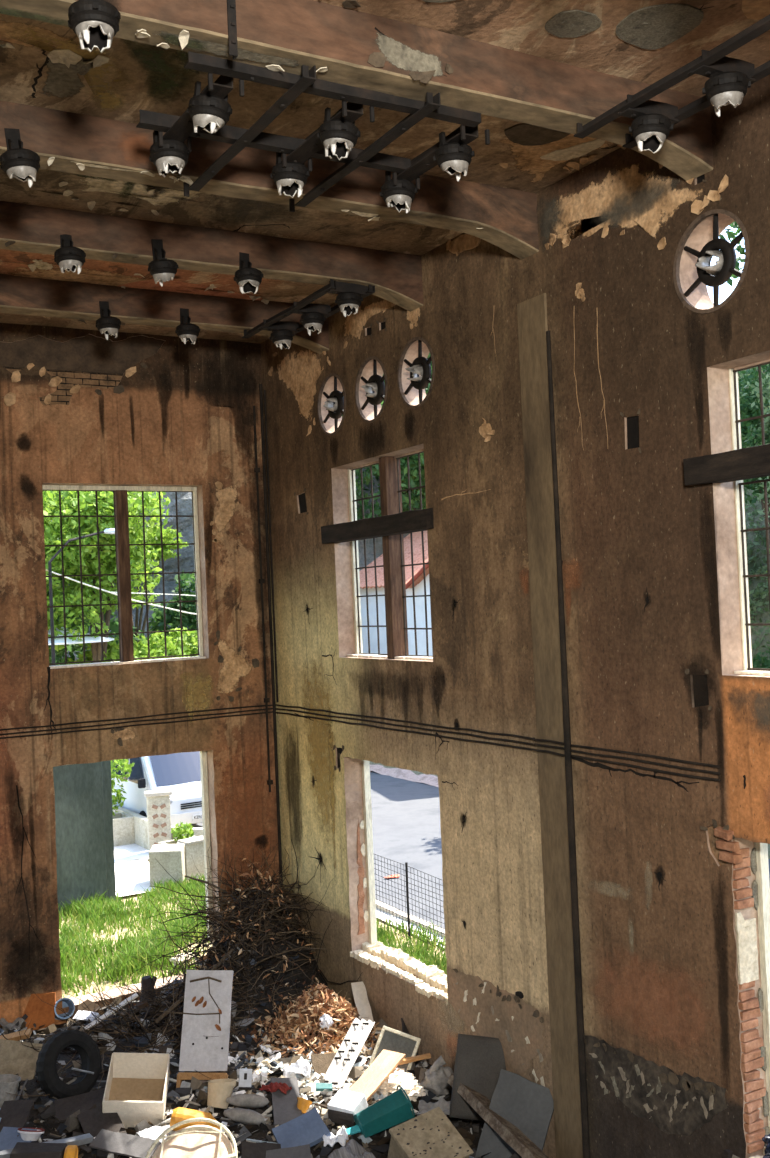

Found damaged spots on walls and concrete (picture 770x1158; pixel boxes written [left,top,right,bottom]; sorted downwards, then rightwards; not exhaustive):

crack [31,49,49,98]
flaking render [368,33,454,84]
spalling [544,9,602,38]
spalling [616,3,704,50]
flaking render [499,123,626,182]
flaking render [539,162,728,250]
water stain [157,372,170,435]
flaking render [268,348,331,436]
water stain [702,497,720,653]
water stain [716,693,770,793]
flaking render [447,967,545,1087]
flaking render [583,1034,727,1136]